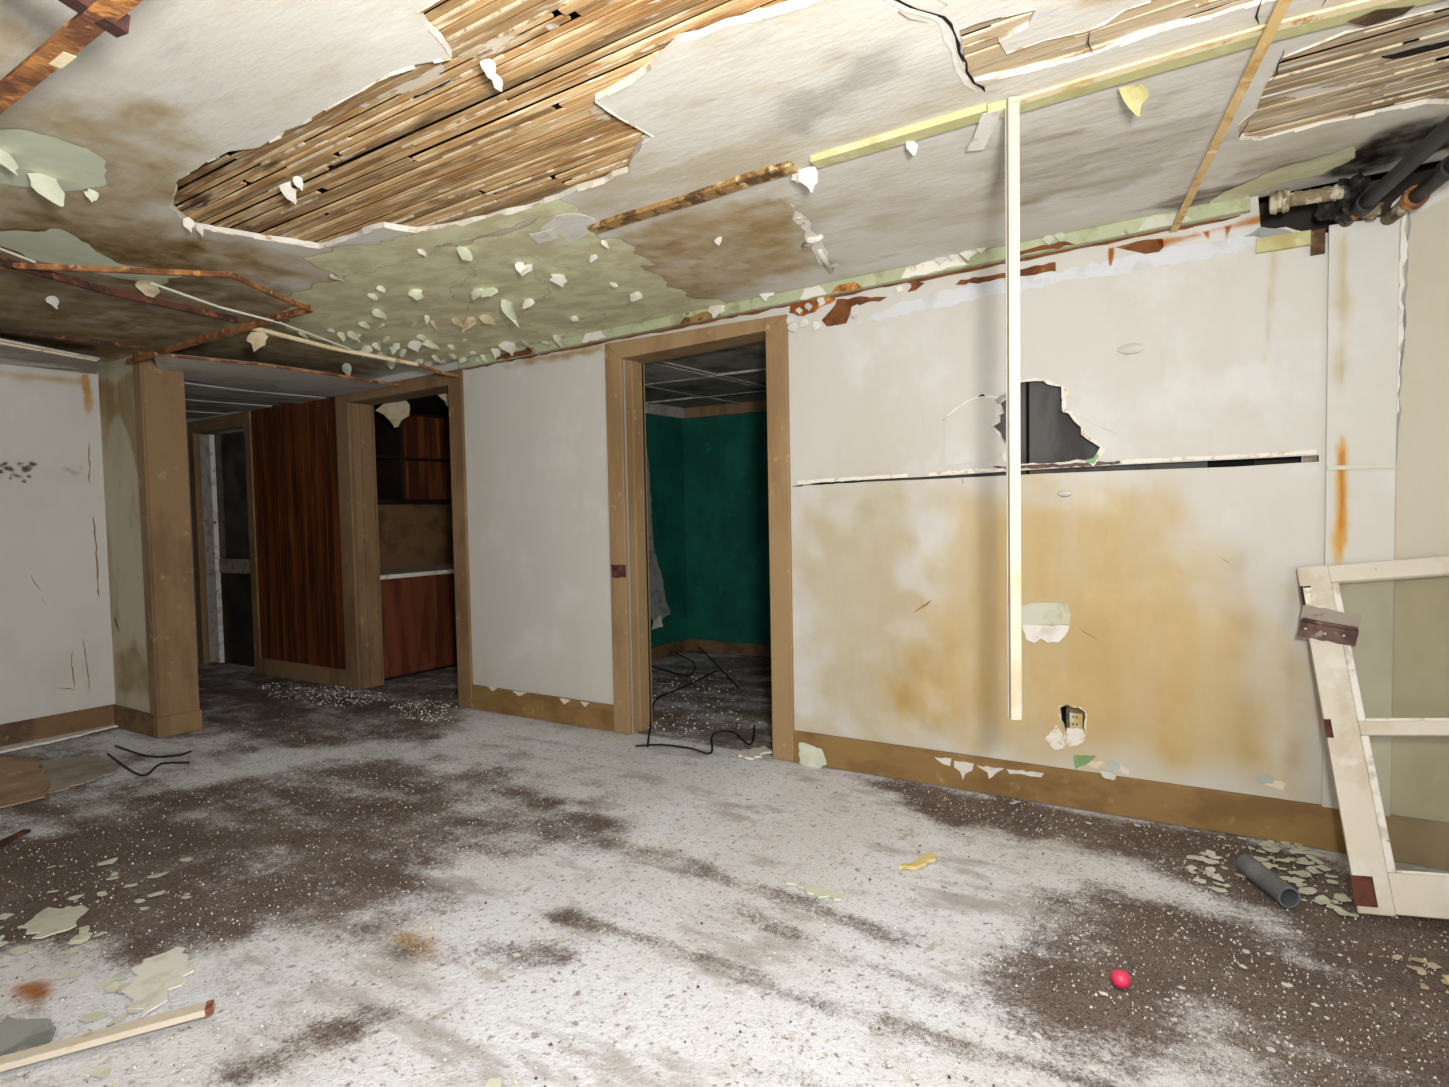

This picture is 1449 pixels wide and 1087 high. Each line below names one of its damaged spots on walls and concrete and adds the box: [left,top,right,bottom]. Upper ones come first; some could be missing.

peeling [49,52,76,69]
crack [885,0,985,92]
flaking render [960,0,1265,80]
flaking render [1236,5,1449,141]
peeling [0,129,109,207]
flaking render [169,0,823,376]
peeling [0,228,182,297]
peeling [46,296,59,310]
hole [811,378,1254,484]
peeling [1021,602,1099,643]
peeling [934,757,1044,780]
spalling [1045,704,1129,780]